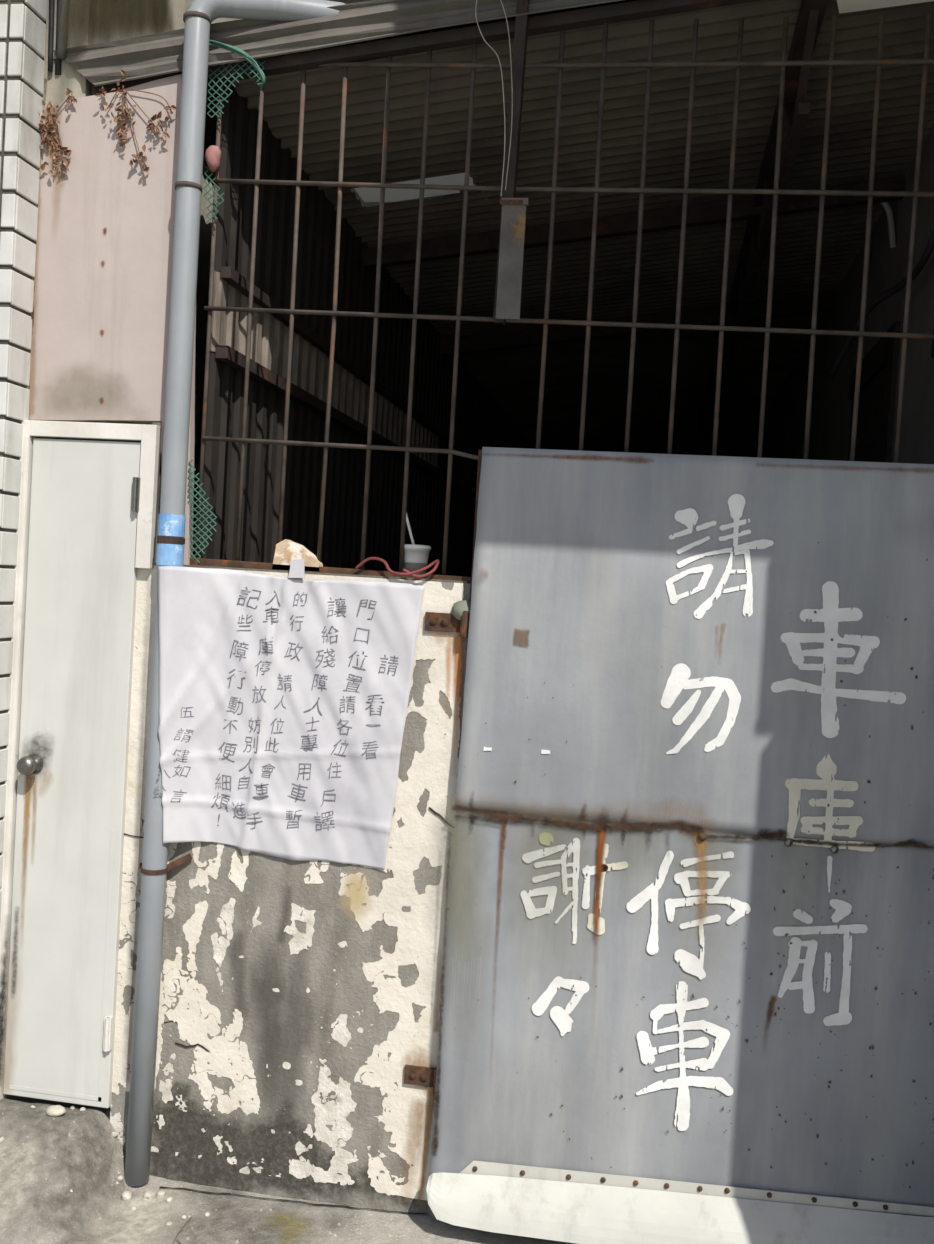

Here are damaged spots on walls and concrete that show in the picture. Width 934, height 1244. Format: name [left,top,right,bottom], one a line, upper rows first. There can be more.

peeling [441,582,470,601]
rust [24,774,35,868]
peeling [401,857,442,912]
rust [452,804,934,937]
peeling [118,873,141,1015]
water stain [259,976,297,1058]
peeling [150,842,434,1217]
peeling [110,1083,129,1150]
water stain [150,1084,419,1205]